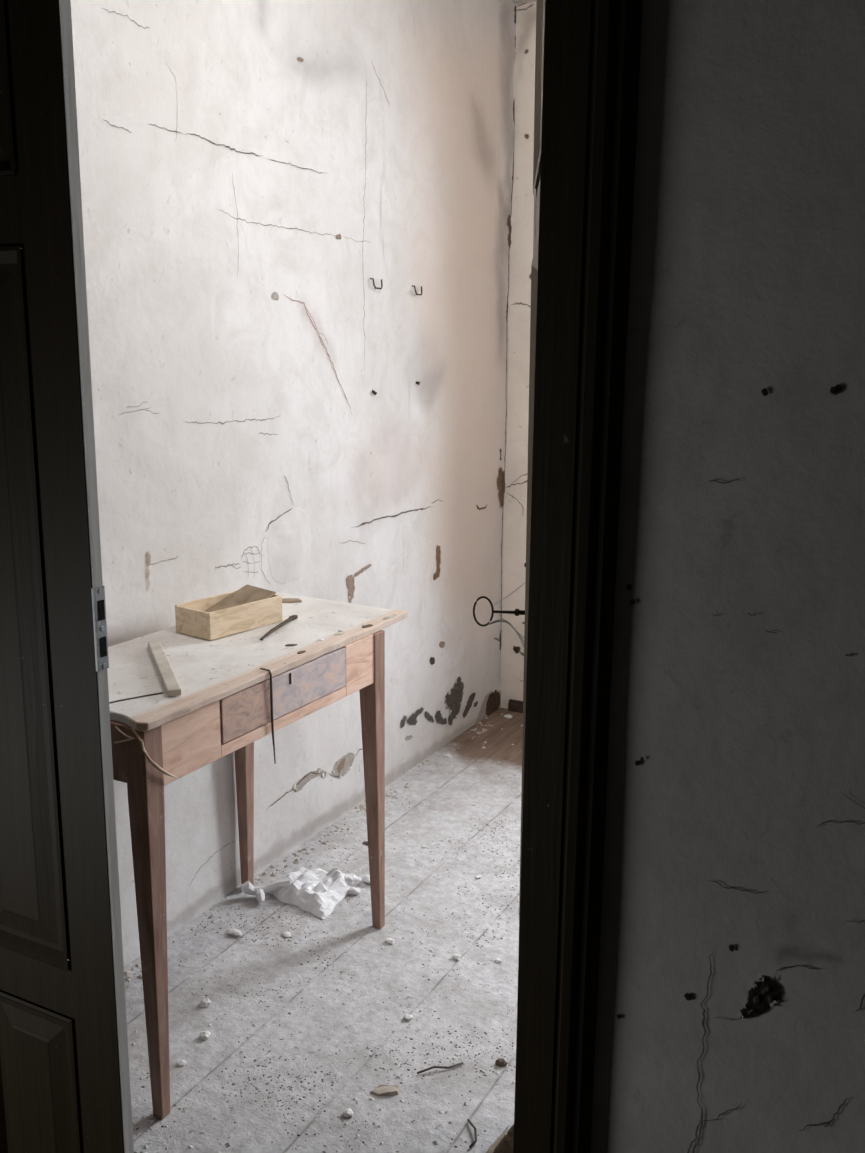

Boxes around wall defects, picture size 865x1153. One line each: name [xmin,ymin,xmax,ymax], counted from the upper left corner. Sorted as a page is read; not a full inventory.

crack [514,3,533,45]
crack [105,63,389,362]
crack [286,296,351,409]
crack [476,99,531,650]
crack [187,418,278,435]
rust [497,468,505,507]
crack [345,499,441,544]
rust [433,546,441,580]
flaking render [740,975,781,1020]
crack [687,947,742,1153]
crack [797,1097,850,1131]